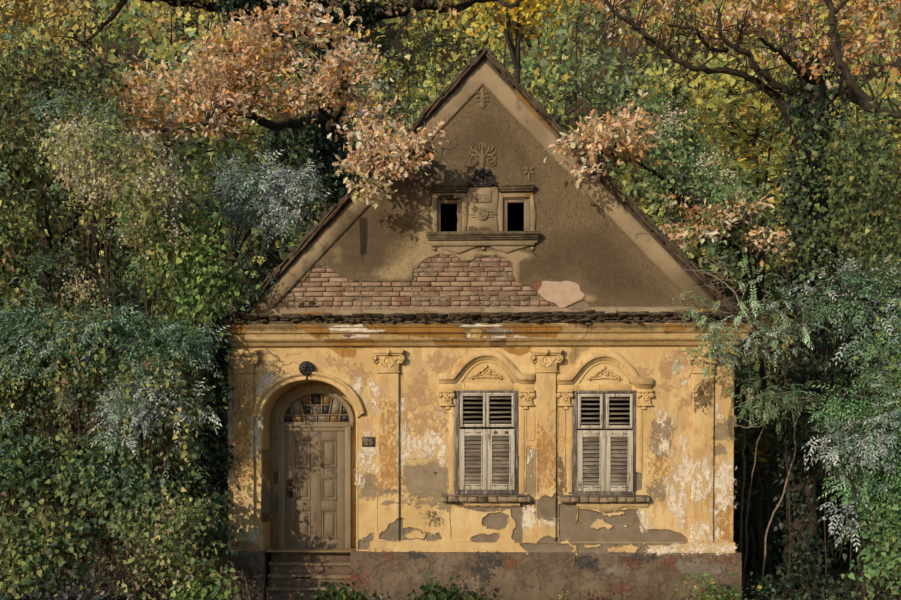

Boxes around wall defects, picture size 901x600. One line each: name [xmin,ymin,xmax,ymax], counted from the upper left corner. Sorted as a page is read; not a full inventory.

flaking render [273,254,590,312]
peeling [328,324,385,339]
spalling [460,323,530,339]
peeling [352,376,382,414]
peeling [249,415,263,461]
peeling [354,430,381,487]
peeling [395,396,449,474]
spalling [452,403,738,600]